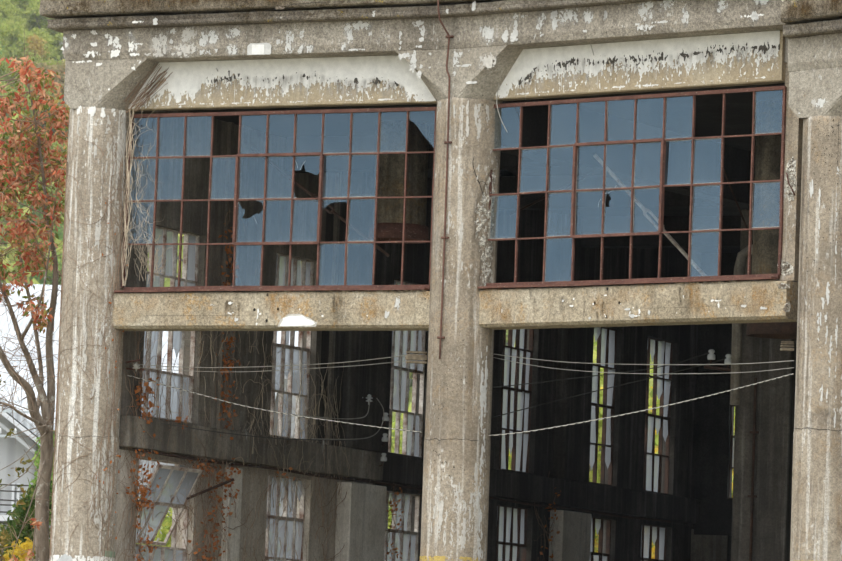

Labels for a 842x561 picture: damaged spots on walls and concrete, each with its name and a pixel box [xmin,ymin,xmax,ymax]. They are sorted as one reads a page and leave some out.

peeling [73,11,436,109]
peeling [453,12,526,76]
peeling [496,0,780,100]
efflorescence [453,100,489,141]
water stain [77,106,126,288]
spalling [474,172,496,291]